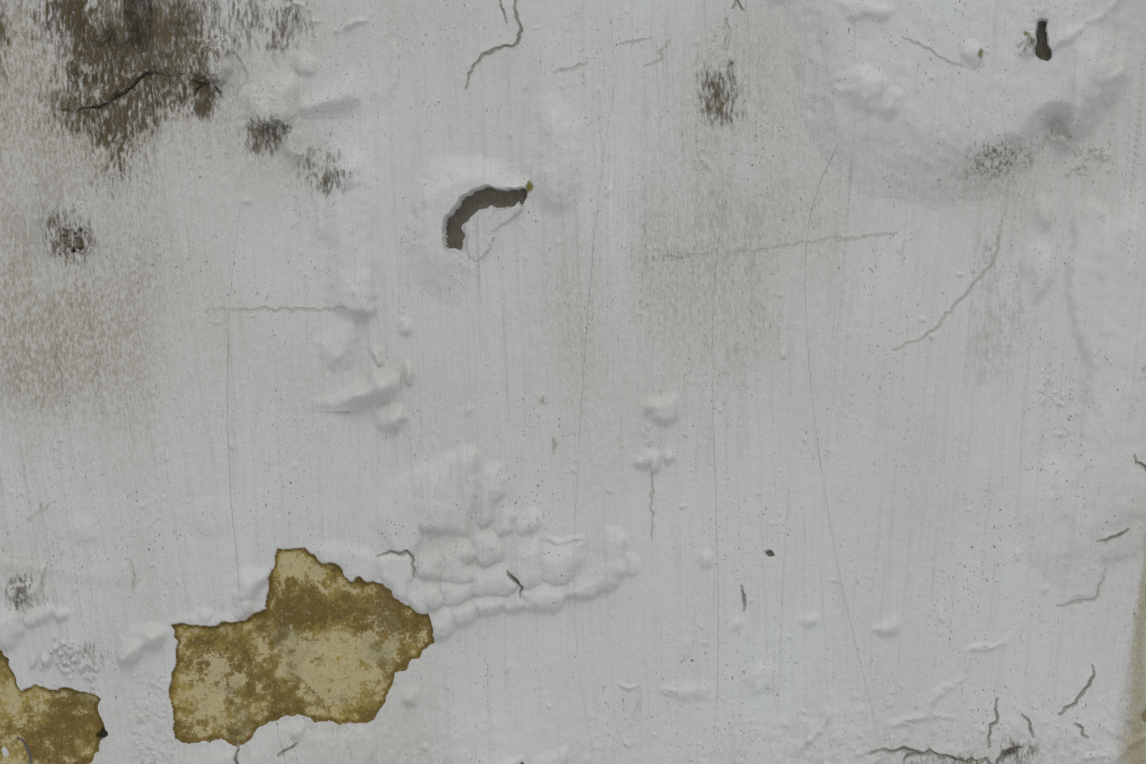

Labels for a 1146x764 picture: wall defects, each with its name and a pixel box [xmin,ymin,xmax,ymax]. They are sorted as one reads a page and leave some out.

crack [464,0,523,90]
crack [61,71,227,116]
crack [1133,454,1146,472]
crack [1056,528,1130,607]
peeling [168,548,435,747]
peeling [0,650,108,764]
crack [870,698,1035,764]
crack [1057,664,1096,739]